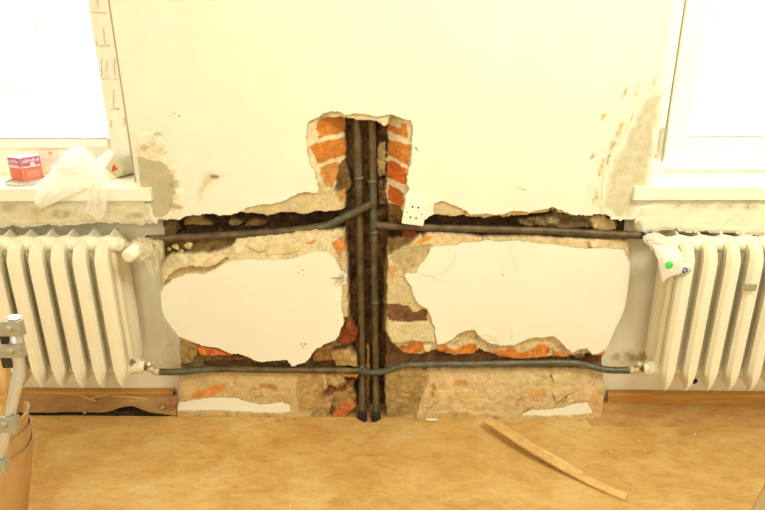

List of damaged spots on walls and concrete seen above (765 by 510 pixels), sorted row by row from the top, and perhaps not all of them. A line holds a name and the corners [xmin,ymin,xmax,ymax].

peeling [133,130,187,219]
spalling [306,111,413,212]
flaking render [386,239,436,343]
spalling [177,372,328,417]
spalling [384,362,604,421]